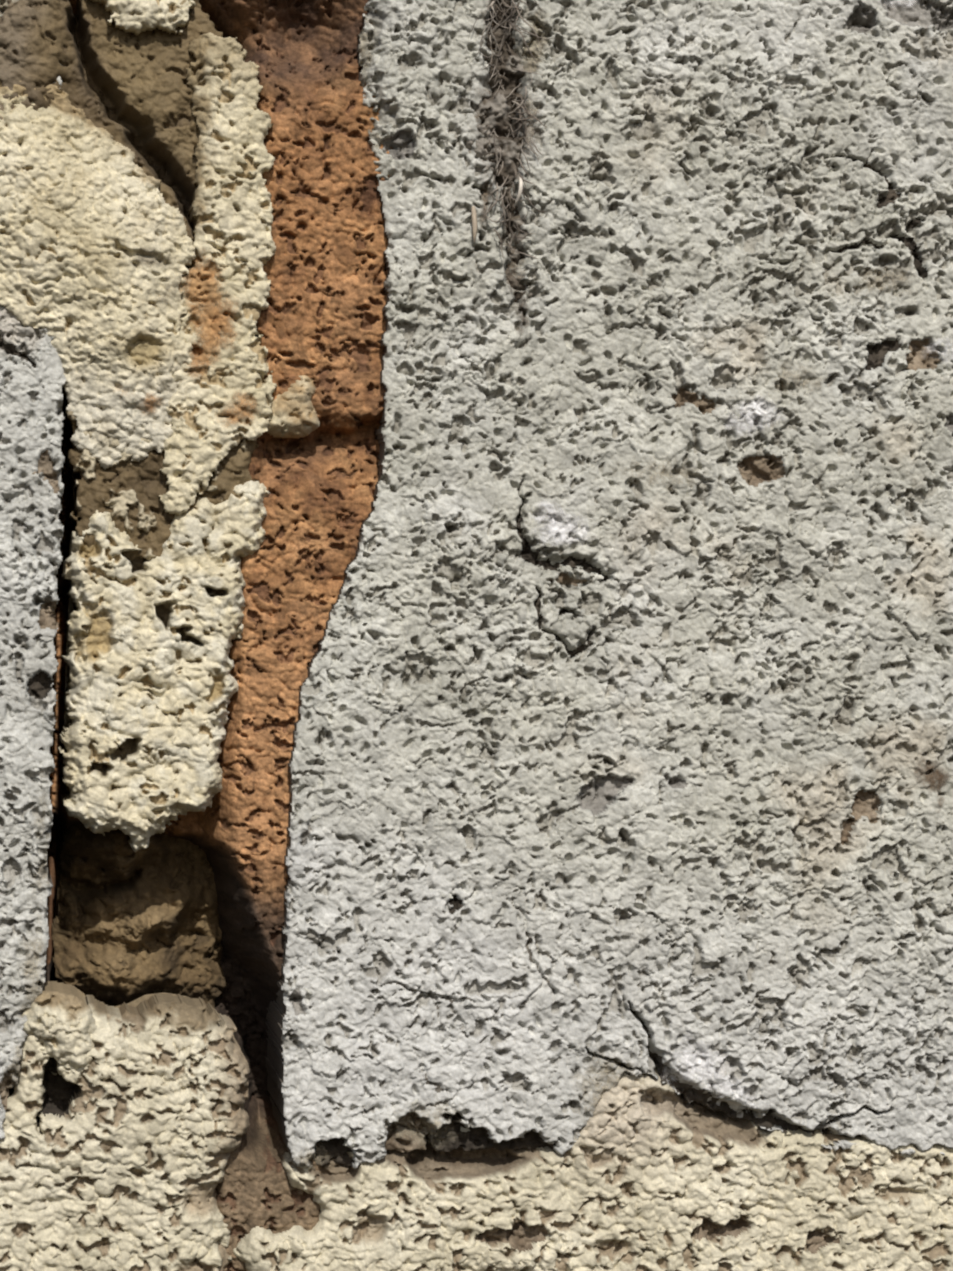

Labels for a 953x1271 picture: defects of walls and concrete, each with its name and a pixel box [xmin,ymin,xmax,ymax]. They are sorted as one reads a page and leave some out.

spalling [32,439,61,493]
crack [516,477,608,658]
spalling [27,671,54,699]
spalling [289,987,312,1016]
spalling [0,1070,15,1110]
spalling [30,1057,81,1134]
crack [595,1009,886,1147]
spalling [385,1098,556,1152]
spalling [310,1138,356,1167]
spalling [475,1221,551,1252]
spalling [691,1208,757,1242]
spalling [806,1229,853,1254]